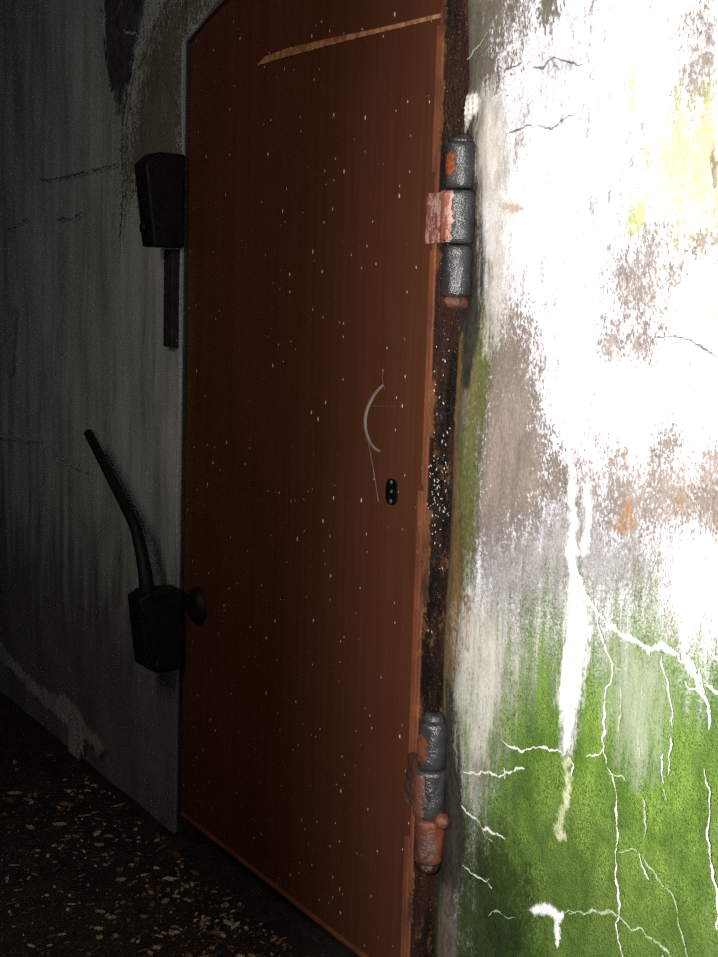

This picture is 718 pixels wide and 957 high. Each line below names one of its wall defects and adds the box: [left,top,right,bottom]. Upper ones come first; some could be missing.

water stain [462,92,516,388]
crack [506,57,582,70]
crack [509,115,589,138]
water stain [709,94,718,189]
water stain [437,449,718,957]
crack [462,568,718,957]